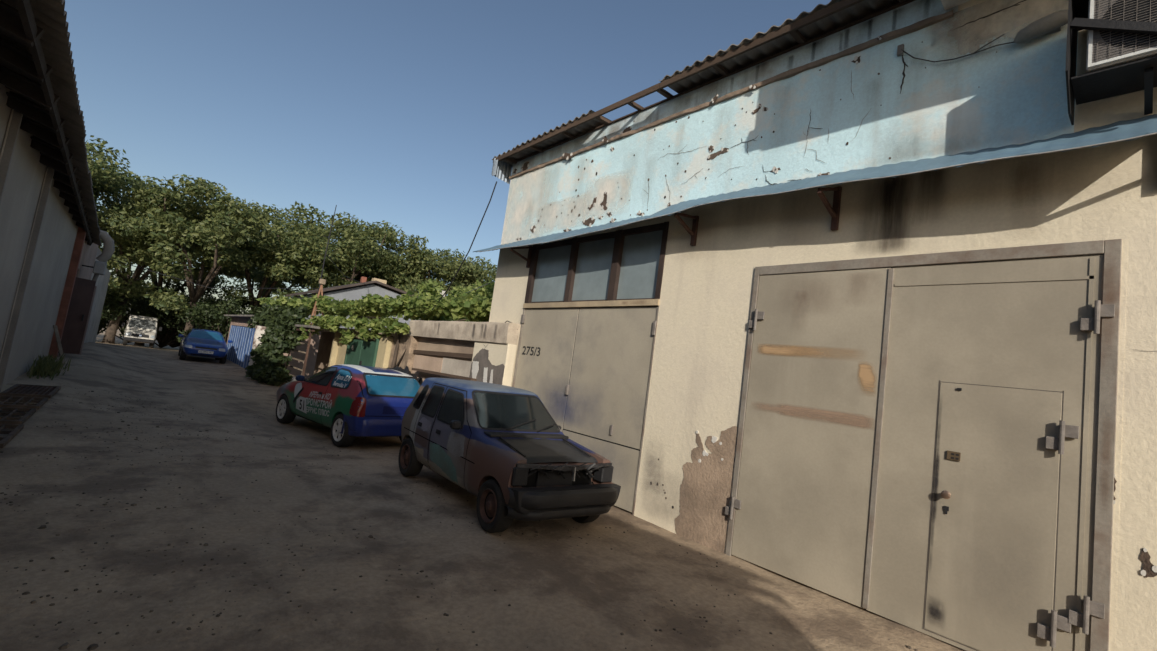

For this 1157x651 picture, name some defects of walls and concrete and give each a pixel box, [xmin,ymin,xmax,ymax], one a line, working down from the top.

peeling [517,153,648,241]
spalling [705,138,729,179]
crack [644,70,871,207]
damp [924,170,942,185]
rust [760,346,825,356]
rust [761,405,869,427]
spalling [650,426,738,553]
spalling [1140,548,1157,578]